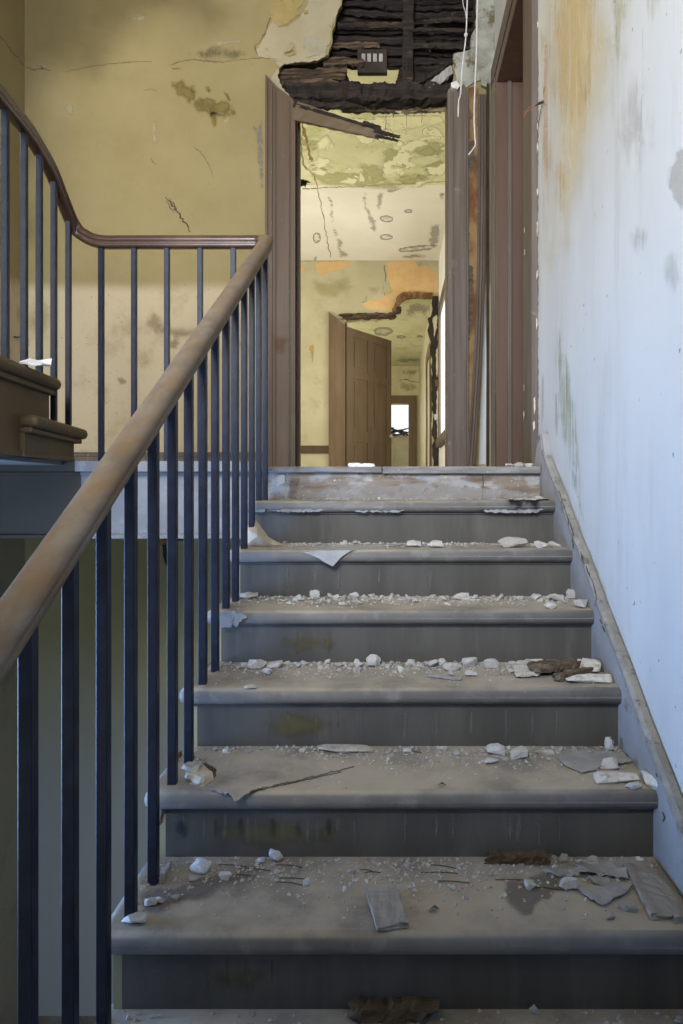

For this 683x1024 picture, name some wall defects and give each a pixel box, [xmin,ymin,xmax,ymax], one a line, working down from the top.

crack [0,17,275,72]
damp [172,81,234,126]
spalling [269,0,495,187]
damp [565,0,593,148]
crack [165,197,191,232]
crack [301,124,445,258]
flaking render [301,261,351,275]
flaking render [362,260,439,315]